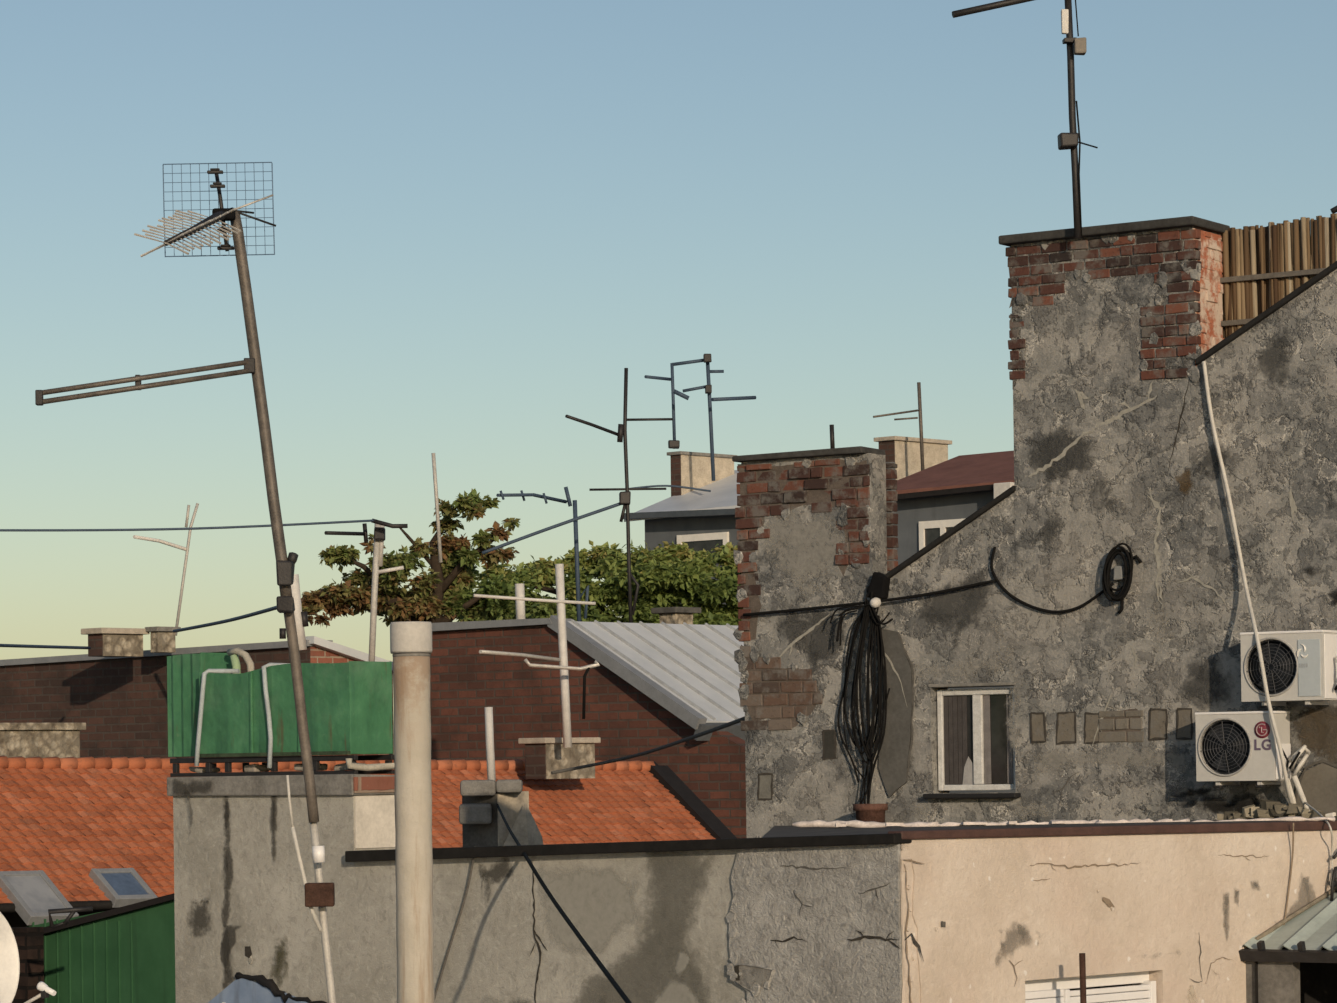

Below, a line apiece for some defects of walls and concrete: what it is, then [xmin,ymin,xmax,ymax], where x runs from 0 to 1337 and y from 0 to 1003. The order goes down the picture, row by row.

spalling [1005,229,1202,388]
spalling [733,456,871,731]
spalling [822,730,837,760]
water stain [190,796,239,988]
water stain [480,859,511,888]
crack [530,861,547,1003]
water stain [581,852,707,1003]
crack [770,865,891,945]
crack [847,930,900,949]
crack [1030,863,1139,881]